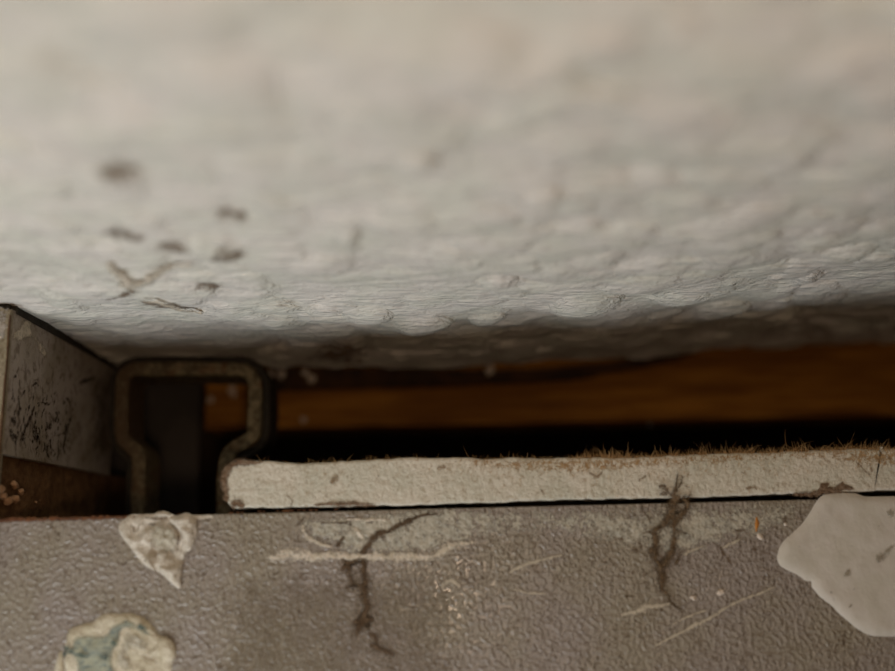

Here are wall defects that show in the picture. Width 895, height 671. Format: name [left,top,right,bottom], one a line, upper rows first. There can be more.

peeling [119,511,213,589]
crack [297,512,441,656]
peeling [55,613,177,671]